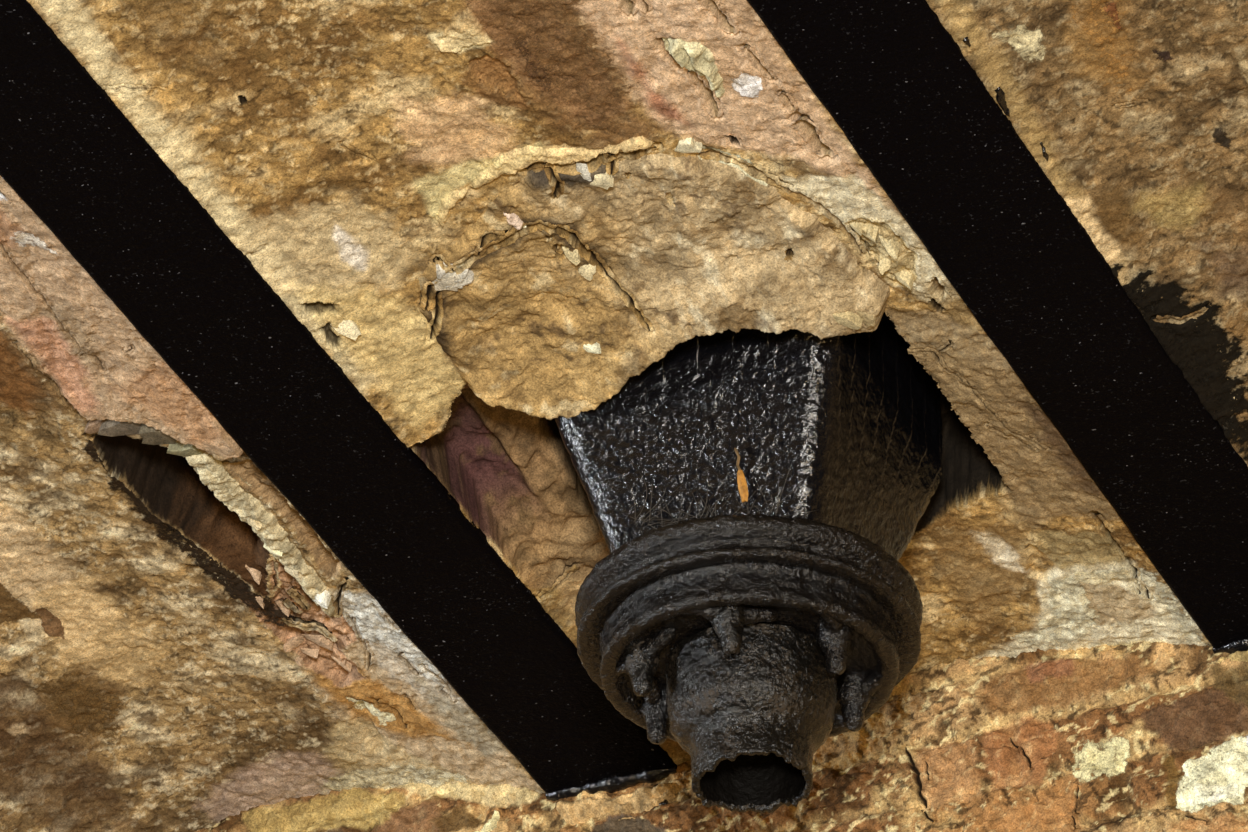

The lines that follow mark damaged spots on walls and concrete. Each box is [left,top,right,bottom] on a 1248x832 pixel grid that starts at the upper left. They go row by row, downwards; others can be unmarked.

crack [0,237,136,371]
leakage [0,583,65,639]
flaking render [0,298,369,689]
spalling [410,382,610,591]
spalling [885,312,1015,538]
crack [1091,513,1154,600]
leakage [35,670,125,740]